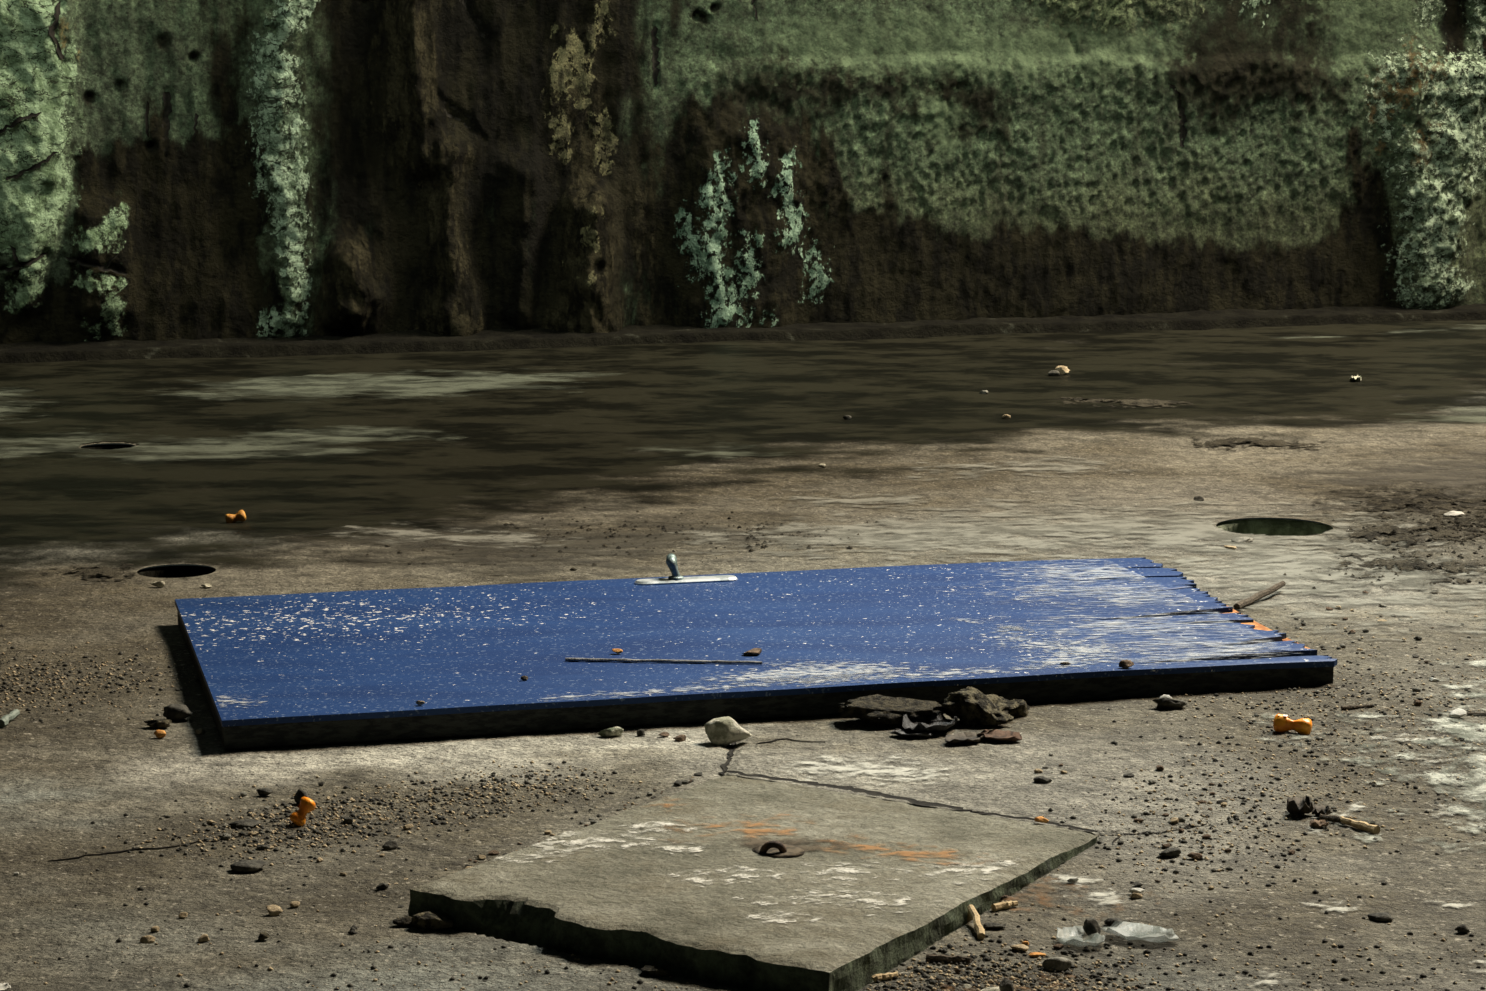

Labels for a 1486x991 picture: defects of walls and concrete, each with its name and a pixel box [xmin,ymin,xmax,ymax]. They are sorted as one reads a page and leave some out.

crack [48,1,64,59]
spalling [84,91,94,106]
spalling [1459,0,1486,136]
leakage [0,0,1486,641]
crack [718,738,1206,843]